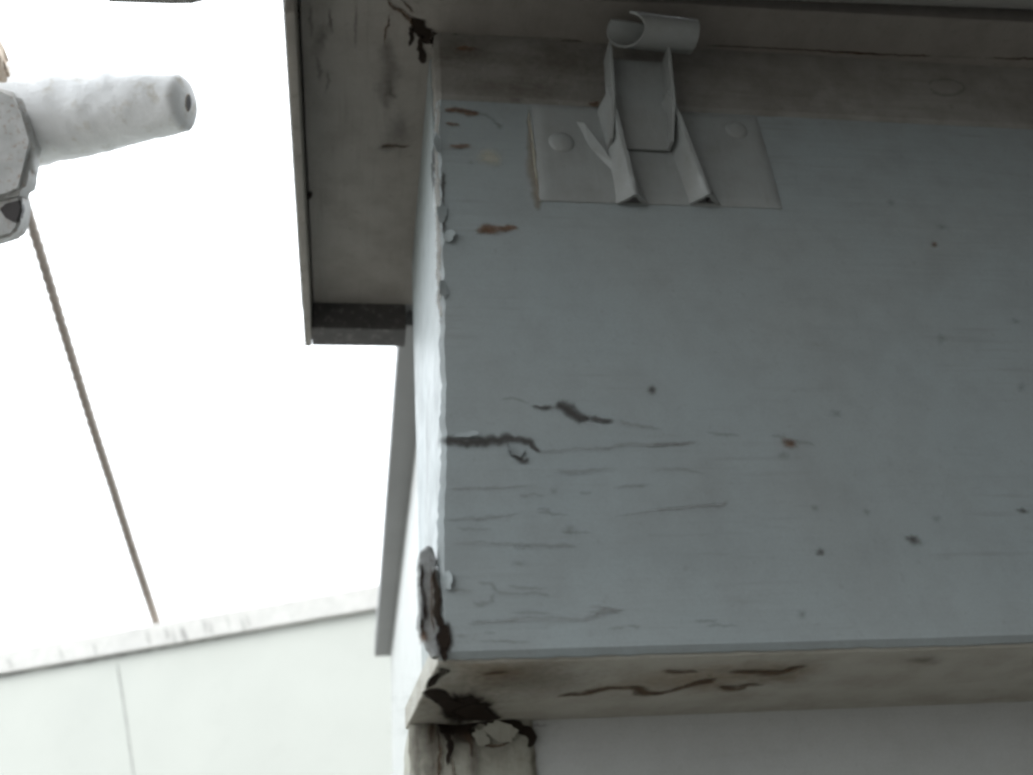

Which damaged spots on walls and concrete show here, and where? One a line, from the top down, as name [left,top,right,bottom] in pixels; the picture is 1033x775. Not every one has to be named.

crack [388,0,457,64]
crack [720,45,928,57]
rust [479,225,517,233]
crack [533,401,612,423]
crack [443,431,539,463]
peeling [442,570,452,590]
crack [558,666,804,697]
spalling [422,689,537,764]